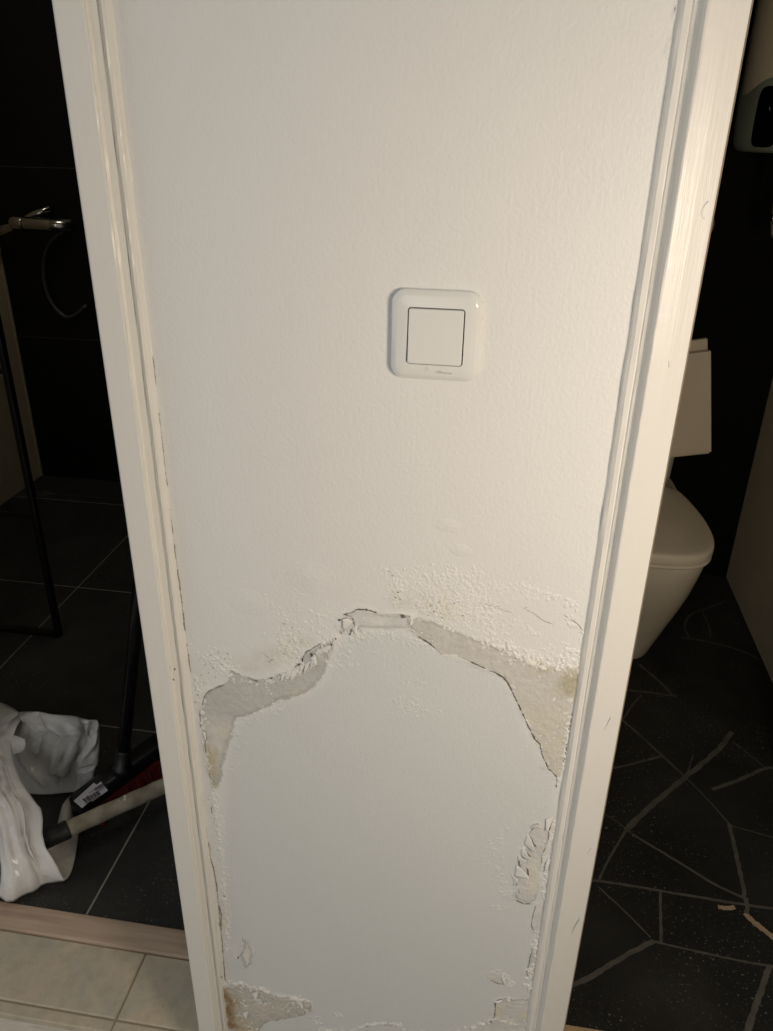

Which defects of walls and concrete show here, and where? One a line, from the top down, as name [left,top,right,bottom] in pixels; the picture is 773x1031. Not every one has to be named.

peeling [194,603,581,789]
peeling [506,816,556,904]
flaking render [224,935,433,1031]